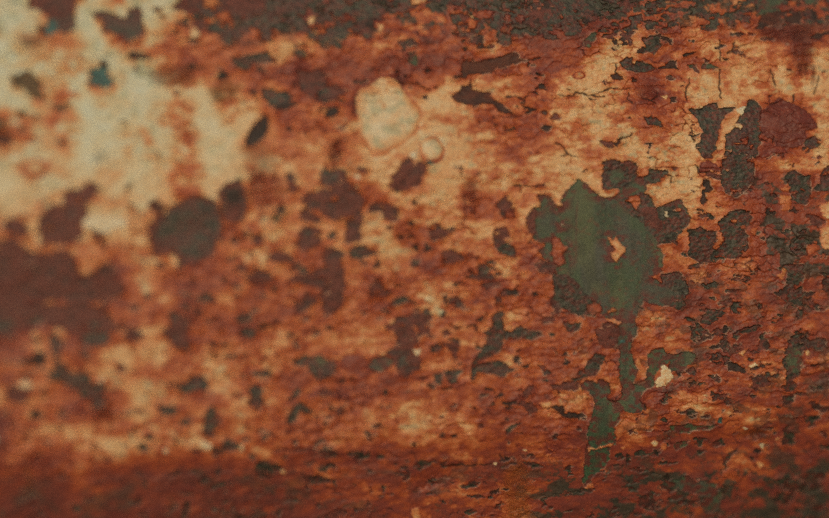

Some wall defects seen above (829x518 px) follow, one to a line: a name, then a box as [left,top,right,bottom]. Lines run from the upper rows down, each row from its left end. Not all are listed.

peeling [93,7,157,72]
peeling [153,0,829,151]
crack [505,91,539,110]
crack [559,64,659,104]
crack [718,39,749,99]
crack [771,70,820,103]
crack [555,143,576,157]
peeling [0,163,399,424]
peeling [365,96,829,518]
peeling [283,333,356,445]
peeling [116,371,299,518]
peeling [301,423,510,518]